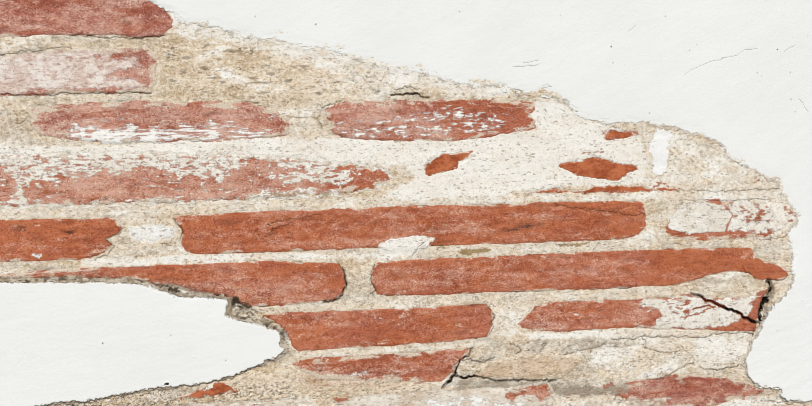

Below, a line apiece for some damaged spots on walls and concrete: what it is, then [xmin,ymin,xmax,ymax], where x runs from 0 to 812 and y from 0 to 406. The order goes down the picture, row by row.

peeling [0,49,146,96]
peeling [336,105,508,138]
spalling [601,117,632,140]
peeling [0,115,394,210]
spalling [424,153,470,175]
spalling [560,154,651,194]
peeling [667,200,776,235]
spalling [0,275,297,406]
crack [541,275,788,380]
peeling [639,277,808,404]
crack [444,348,556,386]
peeling [336,382,556,406]